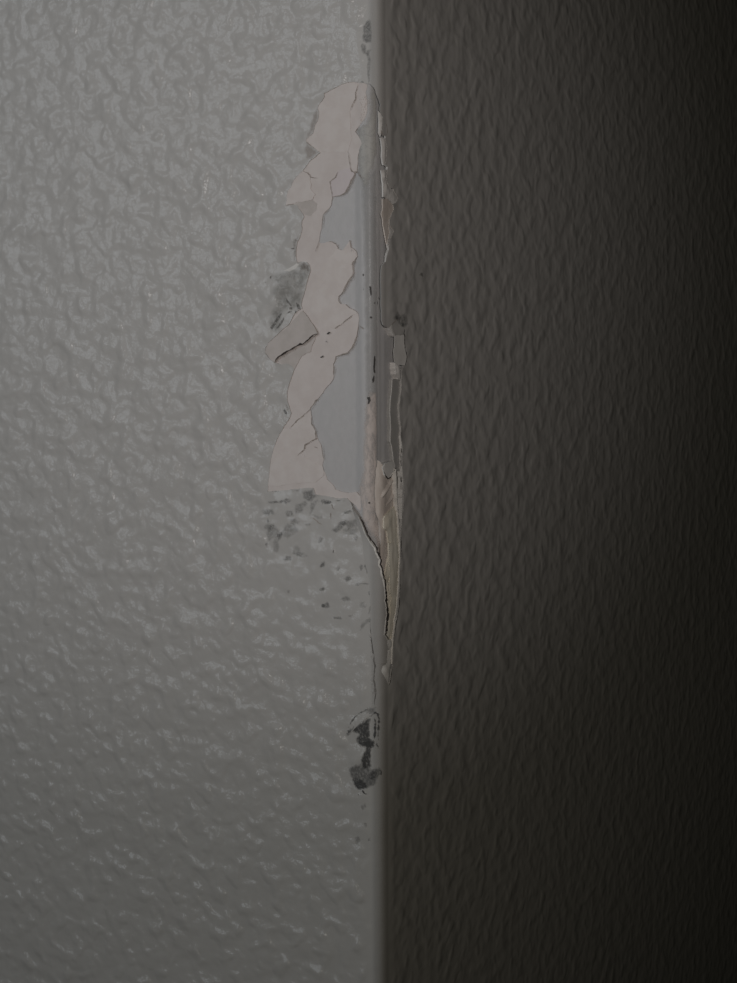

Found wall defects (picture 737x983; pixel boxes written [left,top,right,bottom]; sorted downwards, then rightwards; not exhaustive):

peeling [265,82,398,511]
peeling [384,319,407,381]
crack [350,501,389,705]
peeling [375,436,404,685]